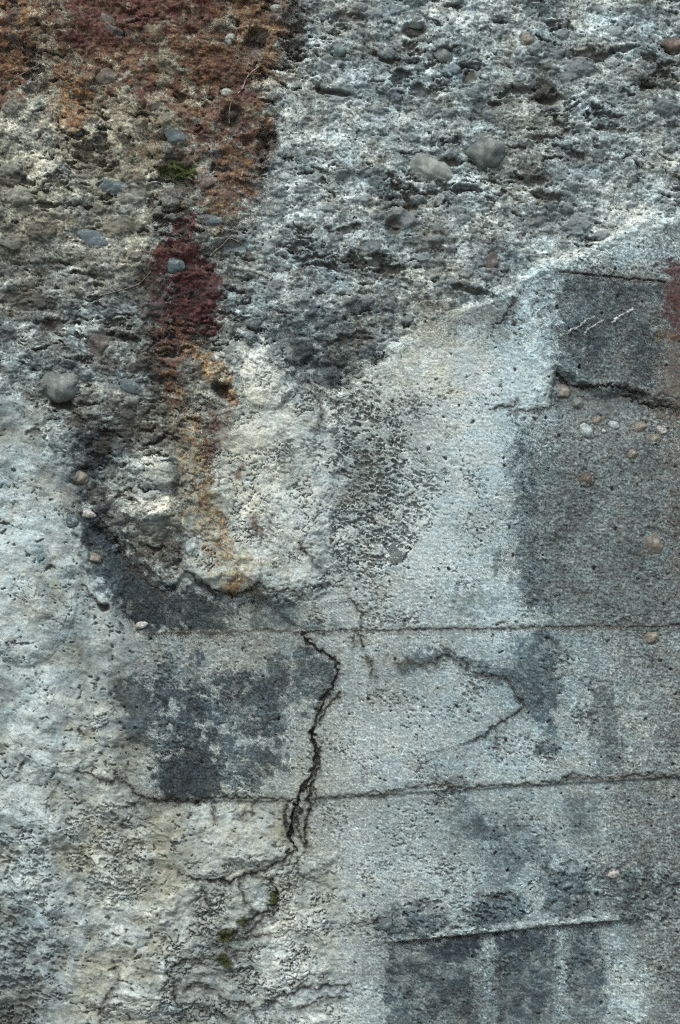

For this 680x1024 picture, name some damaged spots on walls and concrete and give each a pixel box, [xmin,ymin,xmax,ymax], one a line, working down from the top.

rust [0,0,299,596]
water stain [71,423,340,636]
water stain [395,210,680,775]
crack [556,373,672,409]
water stain [113,645,337,806]
crack [76,604,680,1024]
water stain [373,794,680,1024]